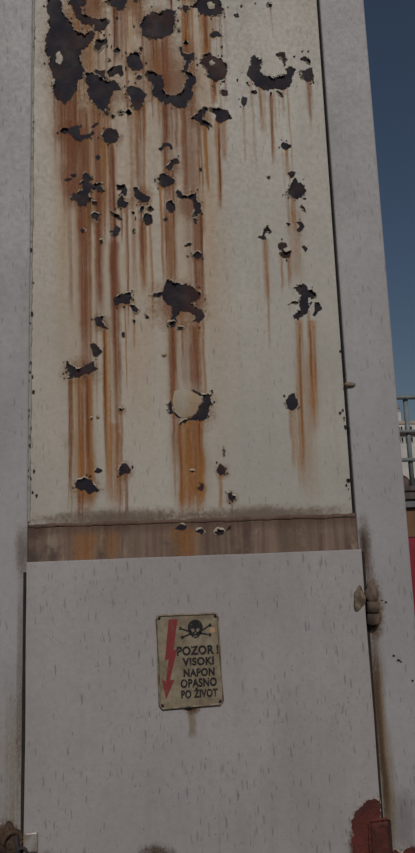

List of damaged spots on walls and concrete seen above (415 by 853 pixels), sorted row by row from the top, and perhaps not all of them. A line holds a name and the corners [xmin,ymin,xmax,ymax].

peeling [43,0,315,280]
rust [60,98,119,482]
peeling [113,250,149,341]
rust [194,214,204,301]
peeling [288,283,322,320]
peeling [62,315,115,389]
peeling [149,278,215,495]
rust [191,326,200,383]
rust [298,348,316,445]
rust [62,486,170,523]
rust [177,420,205,502]
rust [351,798,382,853]